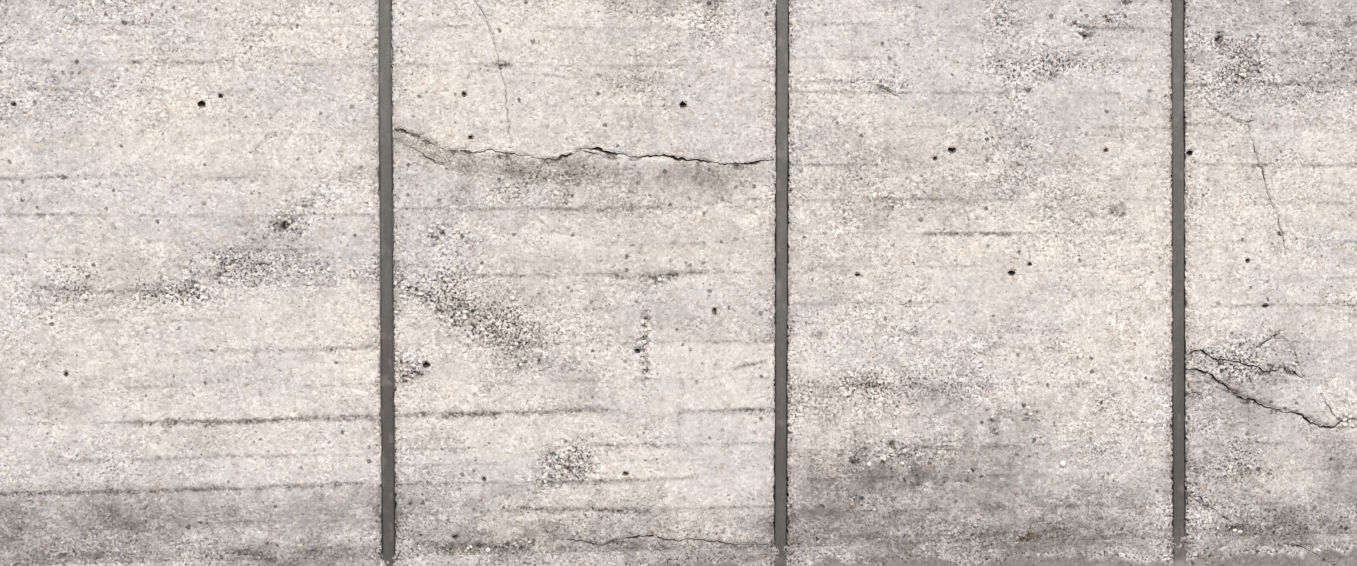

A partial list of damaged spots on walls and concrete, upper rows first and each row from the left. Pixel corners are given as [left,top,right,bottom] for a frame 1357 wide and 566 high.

crack [396,0,773,173]
crack [1187,329,1357,429]